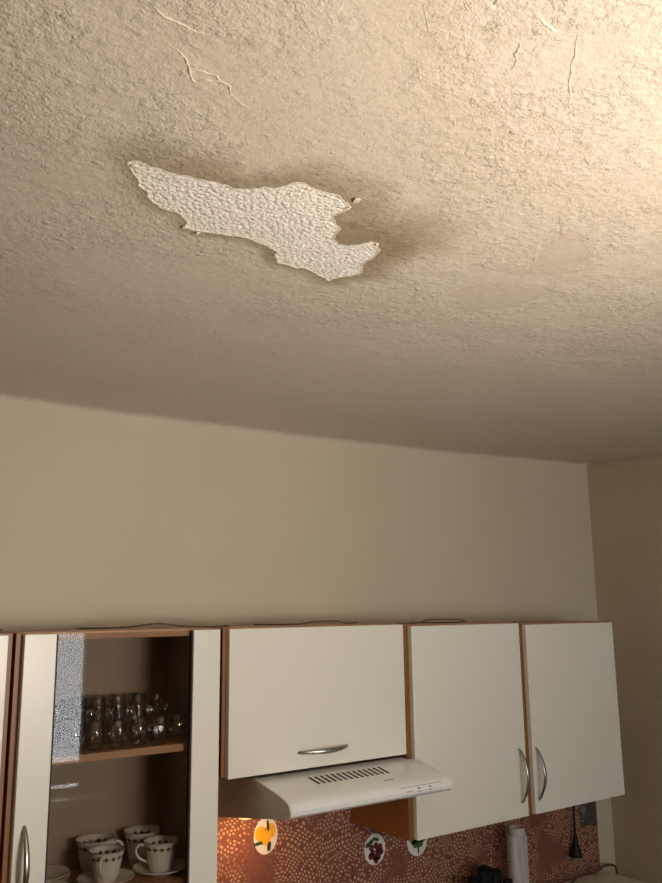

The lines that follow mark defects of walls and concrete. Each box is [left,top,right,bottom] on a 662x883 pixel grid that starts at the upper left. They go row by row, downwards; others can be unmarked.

crack [463,0,521,22]
crack [568,25,579,107]
peeling [126,160,381,281]
damp [175,171,360,245]
damp [299,233,417,282]